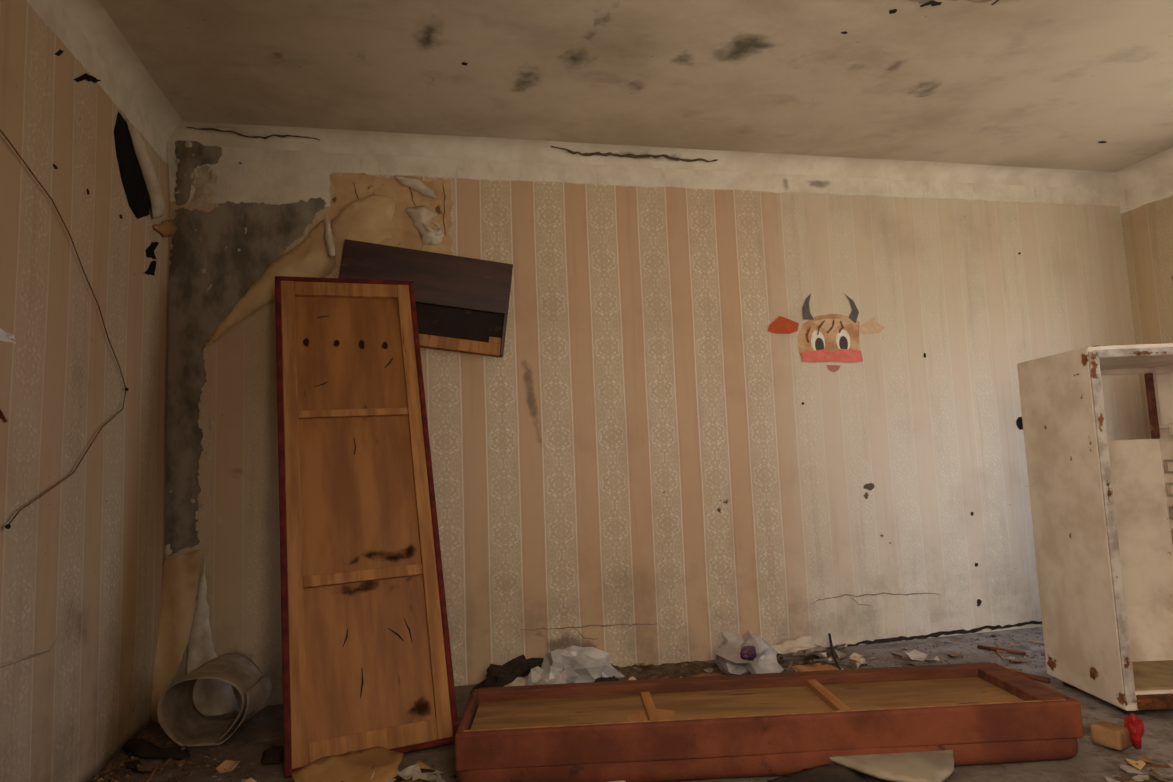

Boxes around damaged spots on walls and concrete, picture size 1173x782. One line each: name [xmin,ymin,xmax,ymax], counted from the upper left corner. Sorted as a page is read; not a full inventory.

crack [187,127,320,141]
crack [551,146,718,162]
peeling [207,173,453,344]